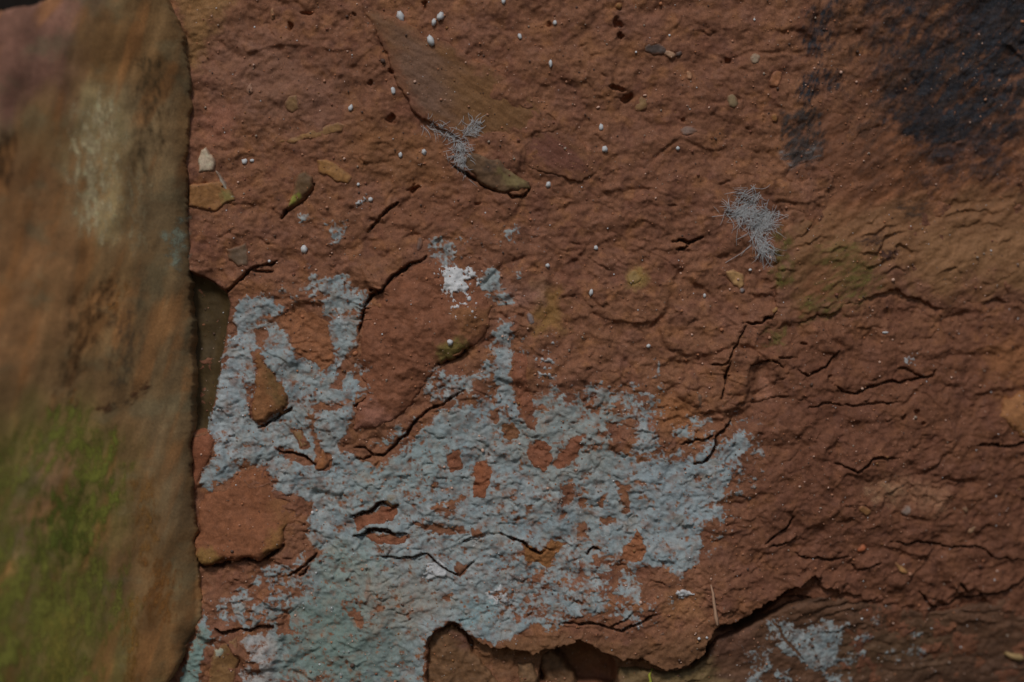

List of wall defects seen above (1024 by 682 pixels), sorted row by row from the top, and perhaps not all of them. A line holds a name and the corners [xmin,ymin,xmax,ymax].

water stain [780,70,840,166]
water stain [865,0,1024,180]
crack [358,256,428,333]
spalling [277,309,334,372]
crack [683,313,935,465]
crack [356,390,463,459]
spalling [447,449,493,498]
spalling [526,434,584,473]
crack [837,456,892,473]
spalling [353,501,407,545]
spalling [524,540,563,567]
crack [767,517,1024,608]